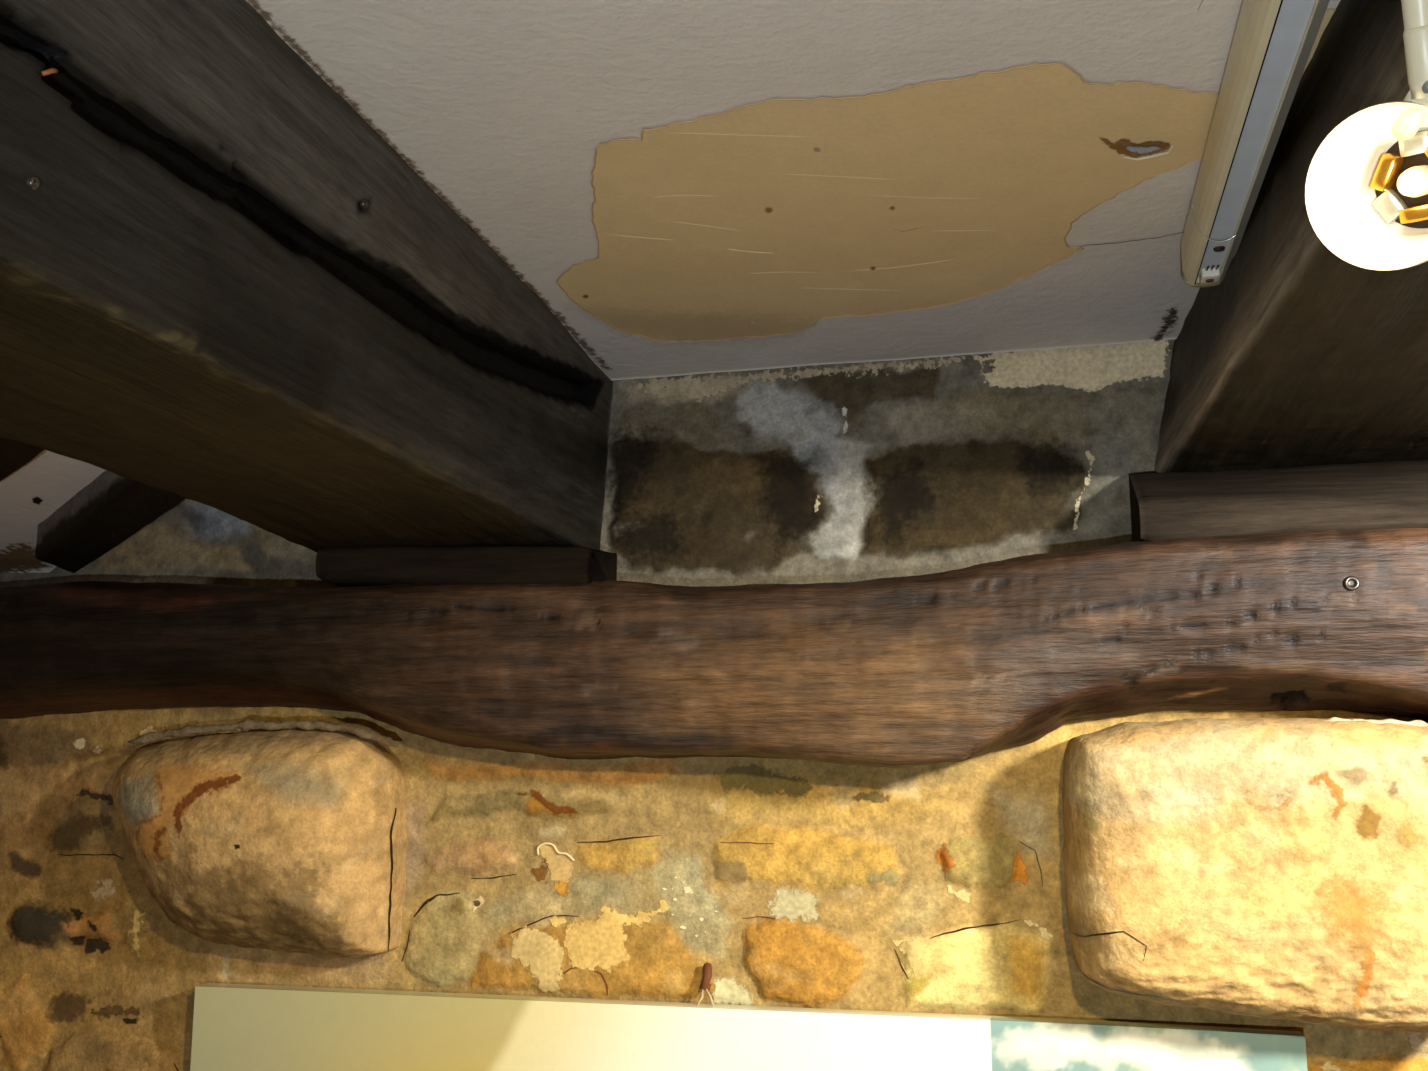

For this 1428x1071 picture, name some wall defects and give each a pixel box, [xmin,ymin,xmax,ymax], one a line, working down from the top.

peeling [1302,9,1335,75]
peeling [556,63,1219,343]
damp [621,354,976,403]
damp [1073,450,1095,530]
corrosion [136,761,241,863]